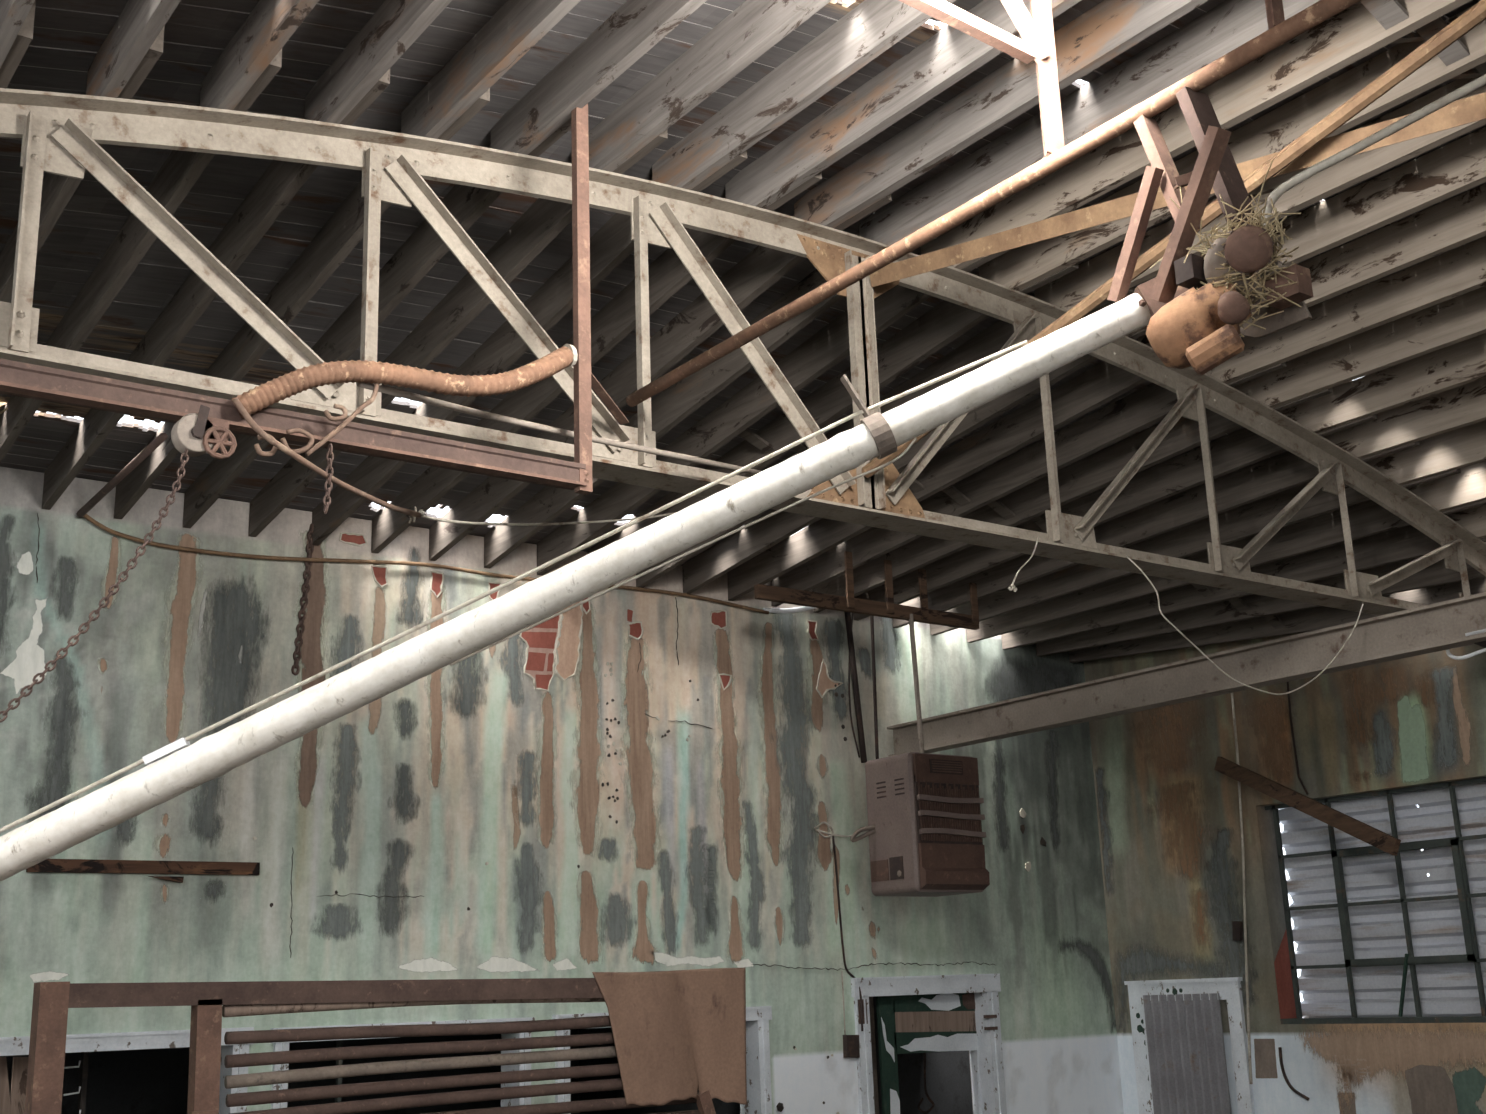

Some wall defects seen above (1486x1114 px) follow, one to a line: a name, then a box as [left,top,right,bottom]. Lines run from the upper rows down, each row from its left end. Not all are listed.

peeling [17,552,34,575]
peeling [0,599,47,694]
leakage [330,615,361,678]
flaking render [519,611,561,692]
flaking render [719,673,732,690]
leakage [332,725,362,870]
leakage [318,904,359,939]
leakage [378,839,412,934]
leakage [658,826,718,954]
leakage [743,802,765,948]
peeling [1338,1093,1356,1114]
peeling [1452,1067,1486,1114]